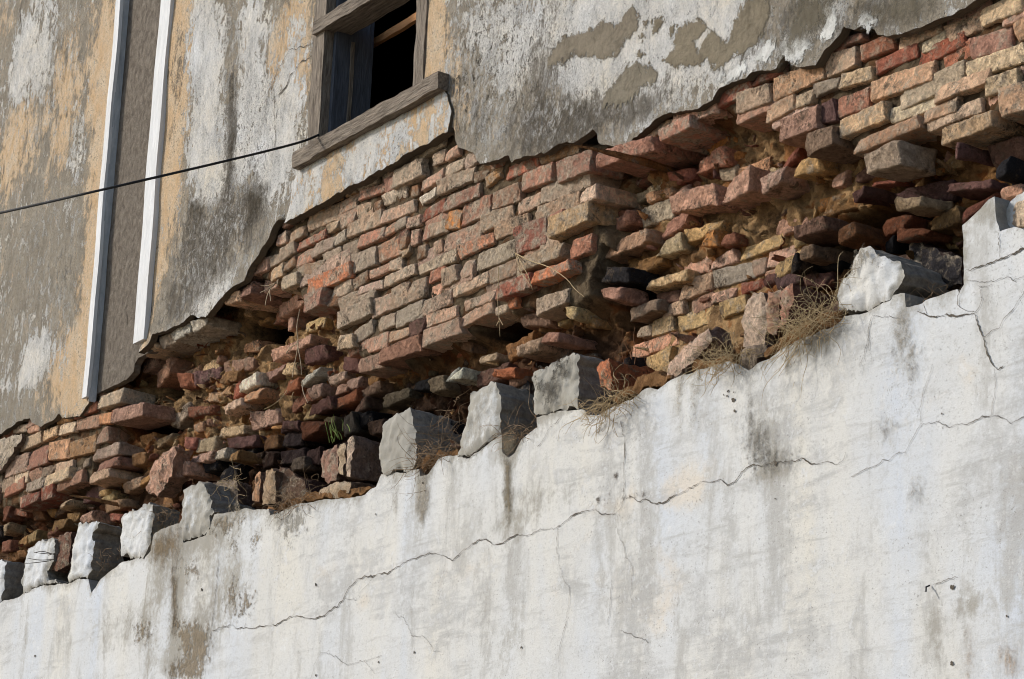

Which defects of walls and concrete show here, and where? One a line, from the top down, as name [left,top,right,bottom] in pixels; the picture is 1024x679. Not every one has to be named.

spalling [854,0,933,34]
peeling [547,0,839,111]
leakage [246,186,266,219]
spalling [570,116,1024,324]
spalling [669,332,697,344]
spalling [0,281,649,563]
leakage [417,480,429,522]
leakage [502,434,515,518]
crack [193,238,1024,679]
peeling [222,573,256,622]
peeling [165,619,213,679]